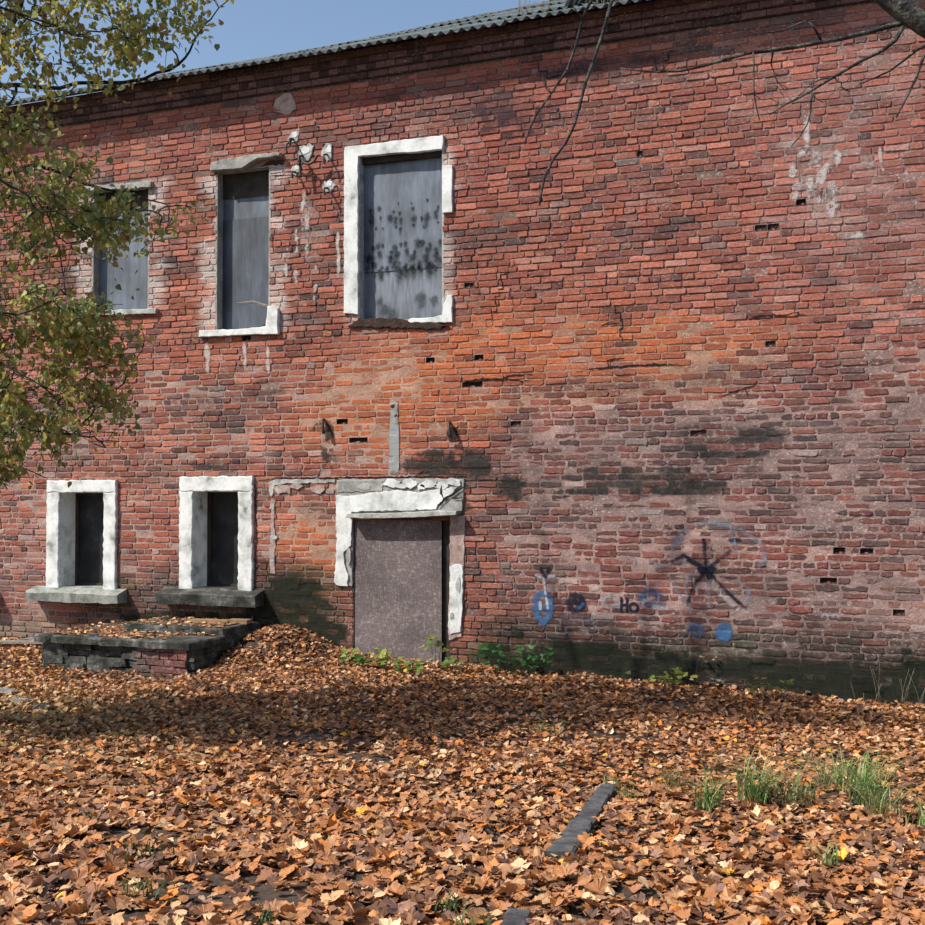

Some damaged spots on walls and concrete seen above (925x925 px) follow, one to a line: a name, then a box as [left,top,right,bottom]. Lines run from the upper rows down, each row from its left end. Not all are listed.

water stain [789,117,842,216]
crack [485,265,515,323]
crack [577,305,676,372]
flaking render [268,478,461,586]